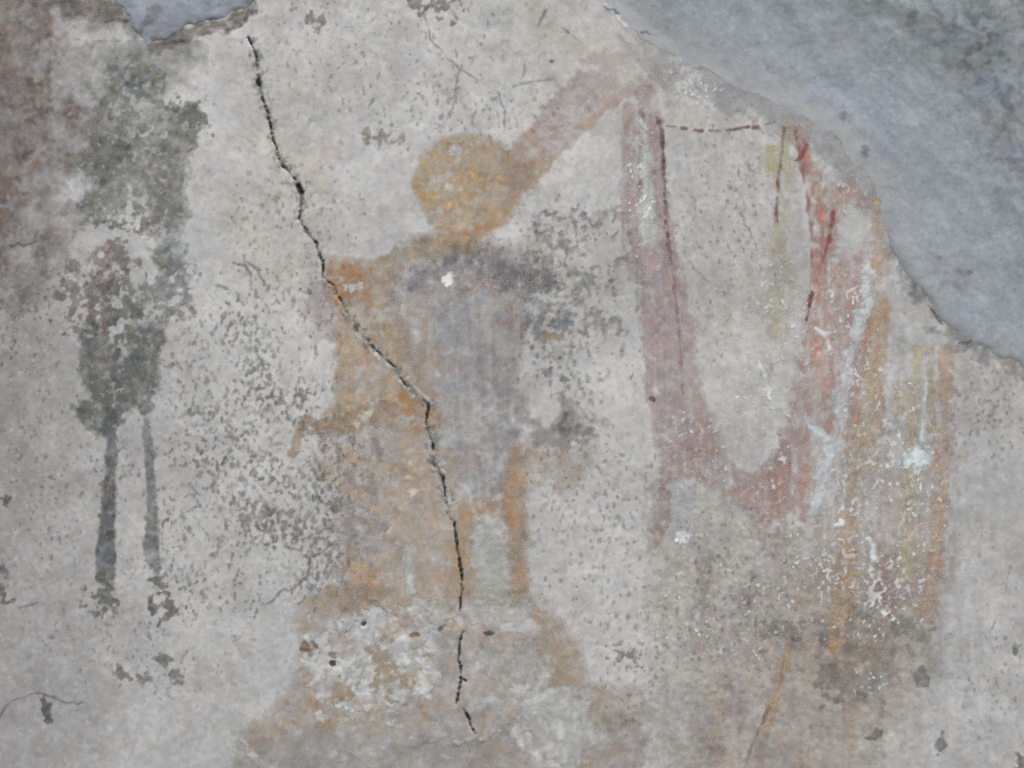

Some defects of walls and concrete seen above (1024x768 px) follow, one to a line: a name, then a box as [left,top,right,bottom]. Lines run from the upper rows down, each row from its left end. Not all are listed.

flaking render [149,6,258,51]
crack [247,37,474,731]
peeling [626,110,657,257]
peeling [652,241,948,661]